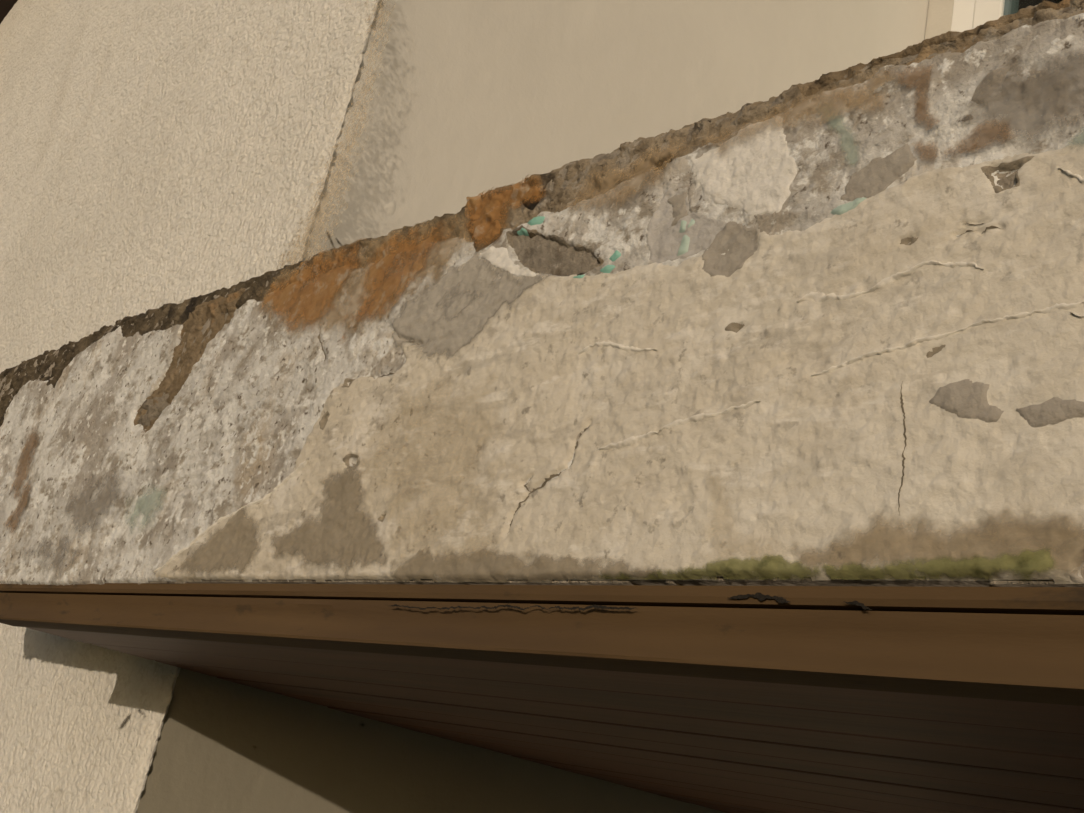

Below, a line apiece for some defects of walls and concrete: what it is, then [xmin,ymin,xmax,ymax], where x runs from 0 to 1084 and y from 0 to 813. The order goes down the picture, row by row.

rust [466,178,542,243]
spalling [0,0,1084,433]
crack [957,222,1000,237]
flaking render [343,454,359,469]
crack [507,424,591,534]
crack [898,381,907,515]